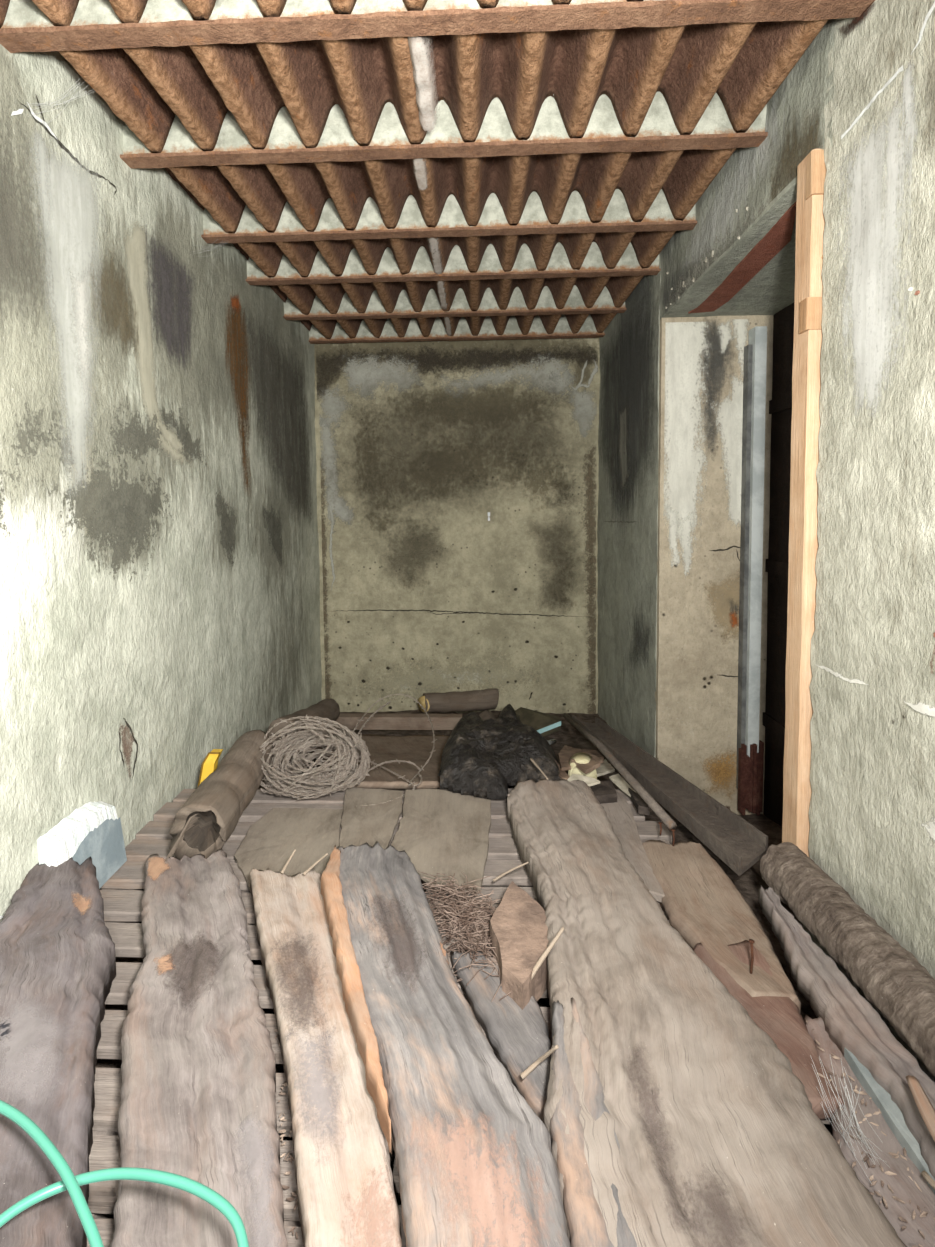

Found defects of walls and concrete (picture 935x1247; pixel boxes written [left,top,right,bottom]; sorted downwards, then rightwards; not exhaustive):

leakage [408,36,438,132]
crack [11,95,117,195]
leakage [413,158,427,190]
leakage [428,238,451,336]
leakage [0,133,207,582]
corrosion [225,297,251,489]
leakage [246,316,749,590]
leakage [215,488,237,568]
leakage [542,525,573,602]